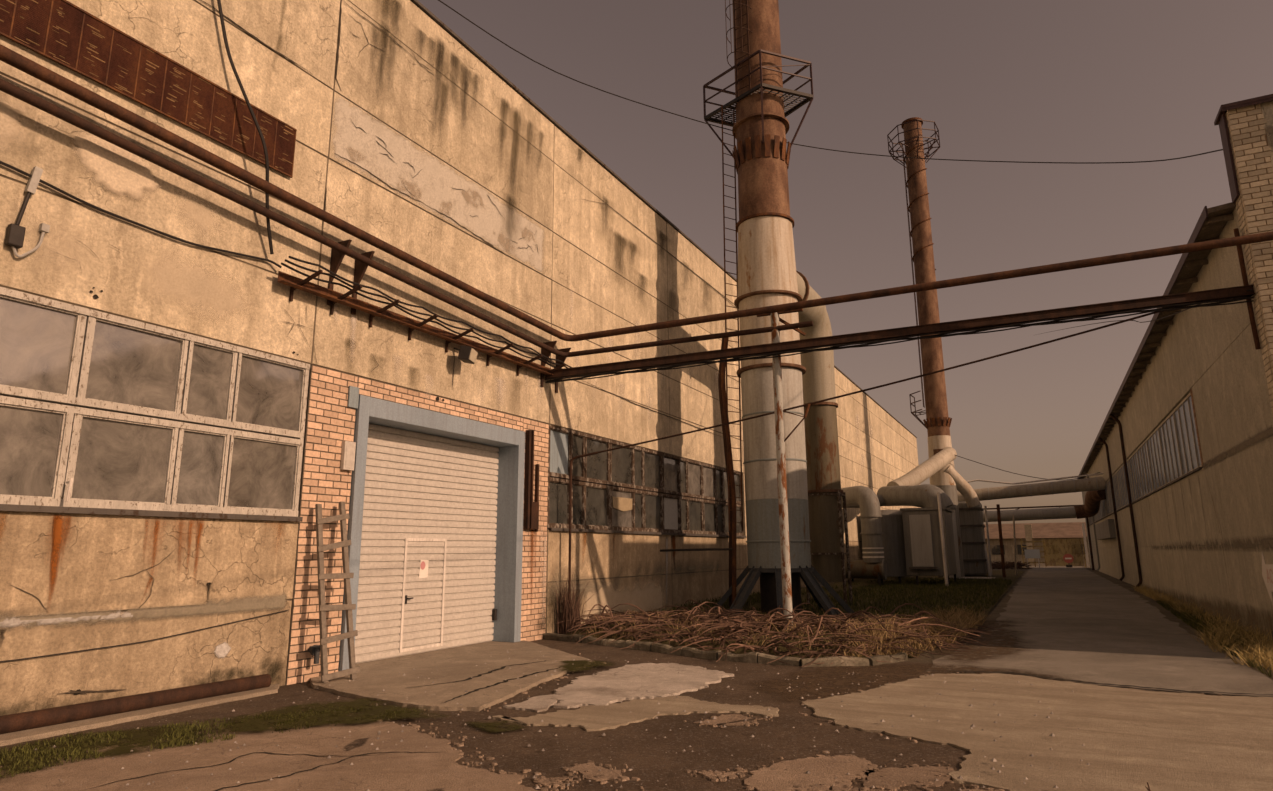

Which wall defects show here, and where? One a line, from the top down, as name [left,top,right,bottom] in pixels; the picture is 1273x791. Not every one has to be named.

damp [437,43,467,93]
damp [503,102,518,177]
peeling [333,98,543,271]
rust [51,516,69,593]
rust [189,522,203,567]
crack [80,752,430,791]